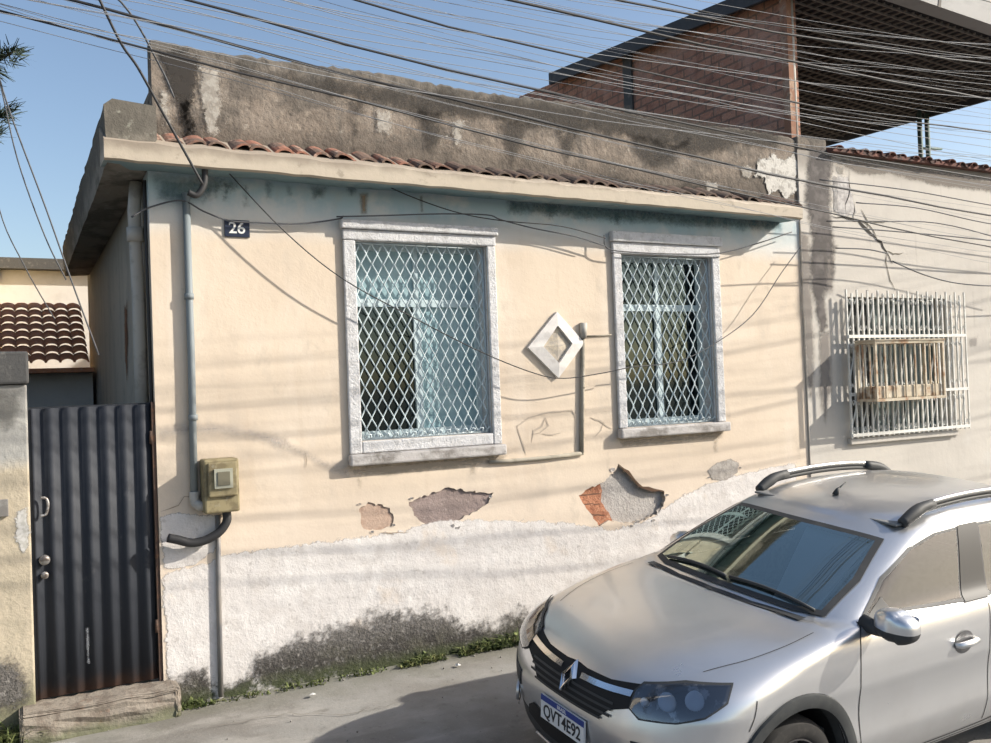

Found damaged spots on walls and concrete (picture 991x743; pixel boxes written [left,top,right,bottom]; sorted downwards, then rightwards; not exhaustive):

damp [159,50,200,138]
damp [239,62,779,166]
peeling [741,152,798,198]
damp [801,149,991,411]
peeling [160,459,796,701]
damp [178,604,528,705]